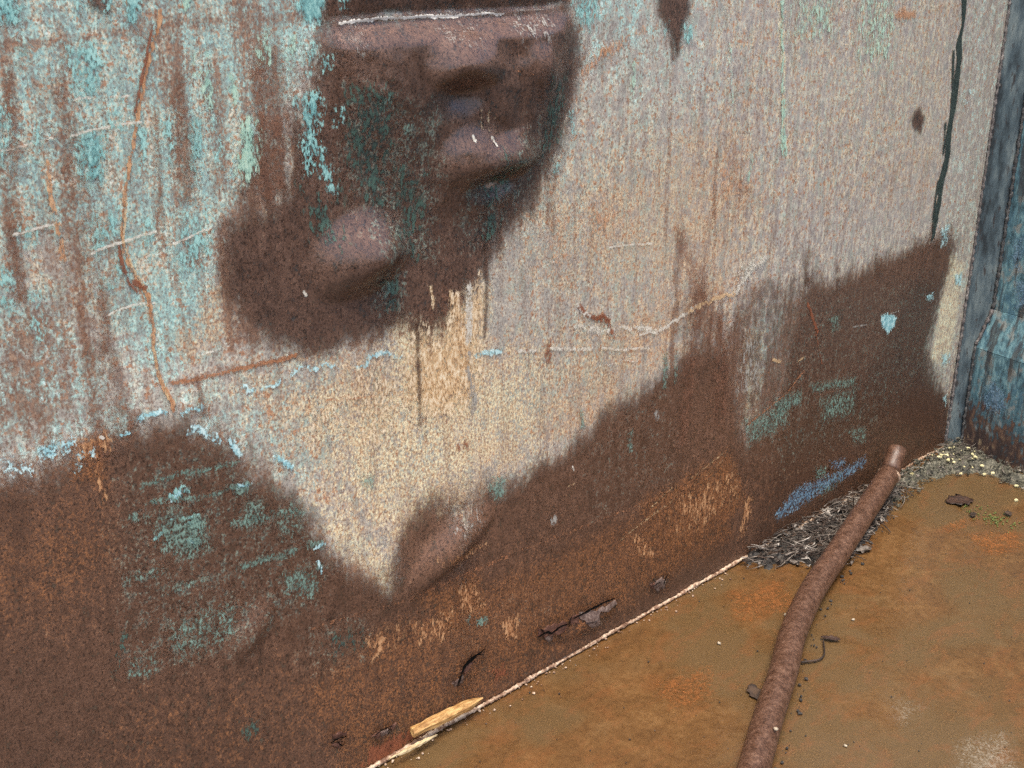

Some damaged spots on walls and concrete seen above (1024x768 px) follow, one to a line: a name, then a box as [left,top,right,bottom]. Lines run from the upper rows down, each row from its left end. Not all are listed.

water stain [0,418,470,768]
water stain [220,0,582,400]
crack [449,648,485,694]
corrosion [671,472,753,537]
water stain [461,0,967,707]